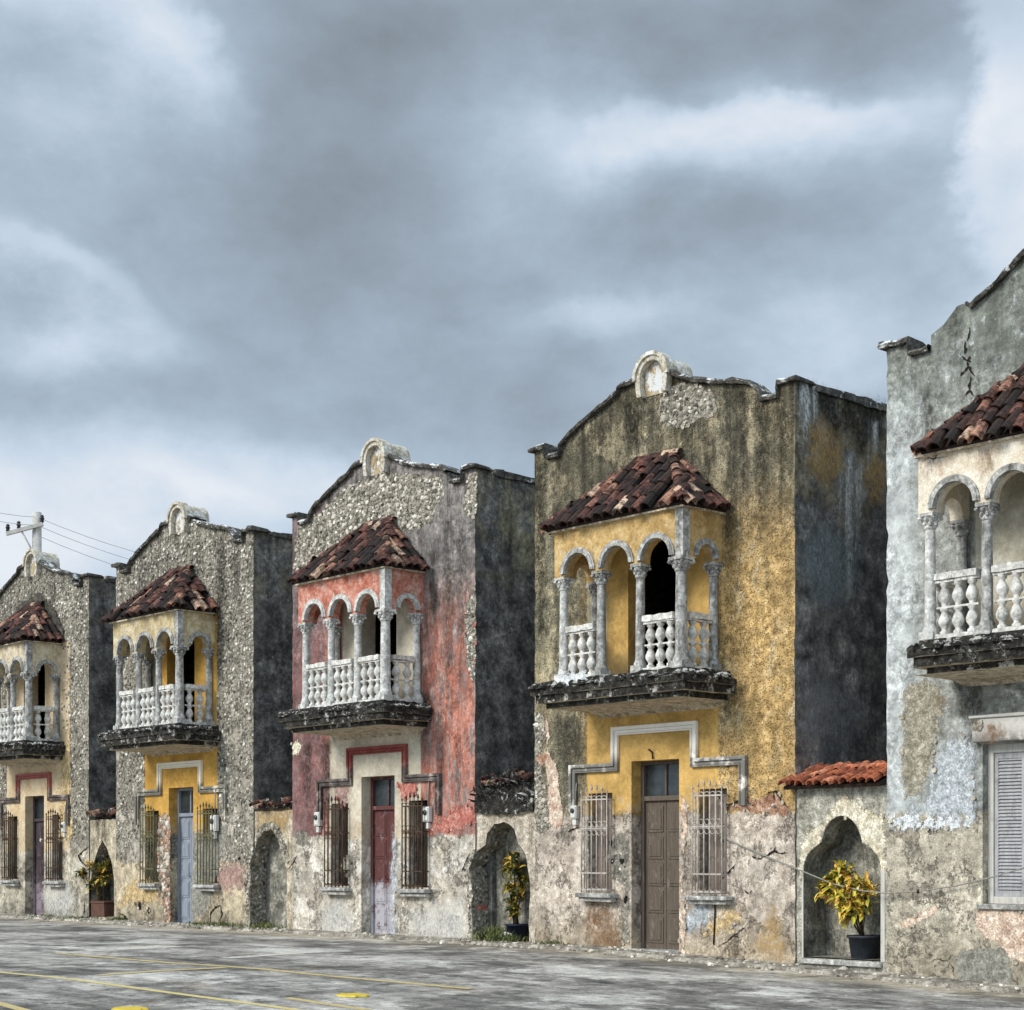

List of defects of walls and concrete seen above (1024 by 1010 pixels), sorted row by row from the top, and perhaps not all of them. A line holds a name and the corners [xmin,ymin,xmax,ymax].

flaking render [657,382,717,429]
crack [960,327,975,396]
leakage [800,384,884,601]
flaking render [463,582,478,682]
flaking render [117,813,171,922]
peeling [429,801,478,837]
flaking render [533,712,563,834]
crack [720,848,786,883]
peeling [797,678,983,883]